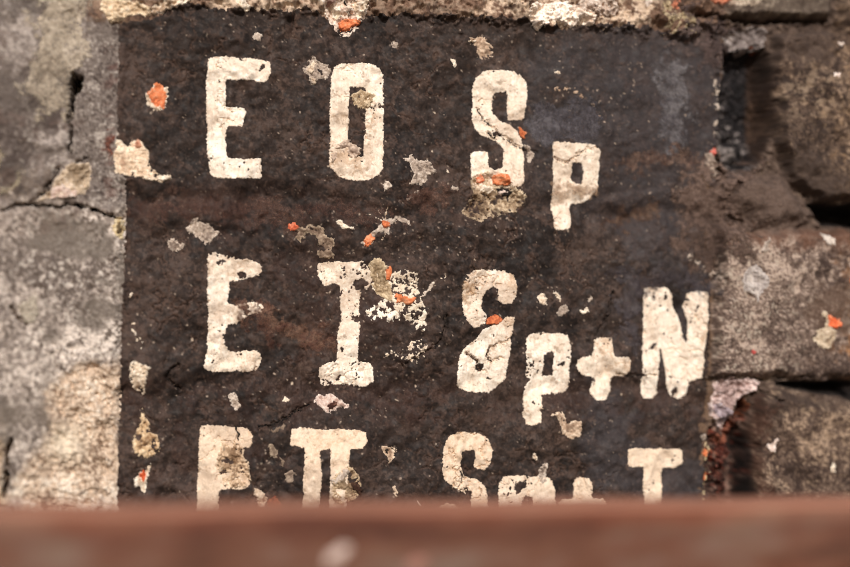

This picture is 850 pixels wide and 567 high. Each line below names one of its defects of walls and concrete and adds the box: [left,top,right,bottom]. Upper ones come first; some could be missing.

spalling [318,0,371,37]
crack [4,113,119,218]
spalling [113,139,172,183]
spalling [403,154,436,201]
spalling [461,171,527,222]
peeling [365,258,446,362]
peeling [712,397,751,424]
crack [2,438,14,498]
spalling [132,408,160,493]